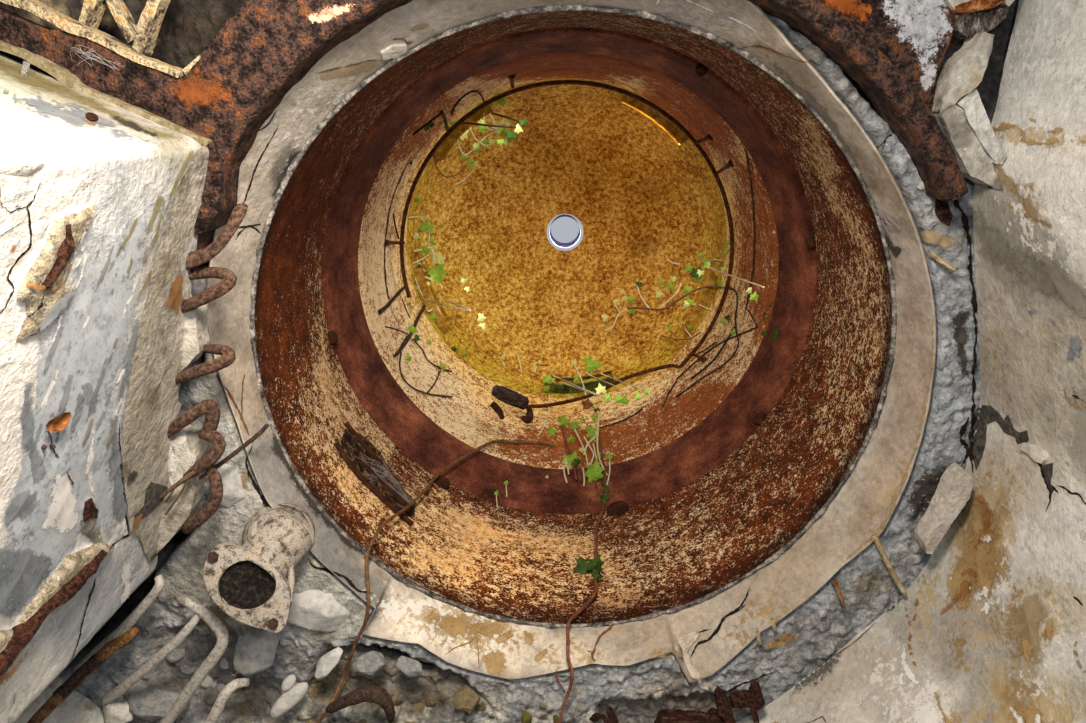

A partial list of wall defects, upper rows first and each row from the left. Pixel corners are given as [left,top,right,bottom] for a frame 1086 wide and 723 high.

rust [308,4,355,23]
crack [0,179,44,317]
spalling [16,205,95,340]
spalling [175,344,236,384]
crack [951,199,978,526]
crack [1037,462,1086,510]
crack [690,588,750,658]
damp [1009,594,1053,663]
damp [1009,698,1044,723]